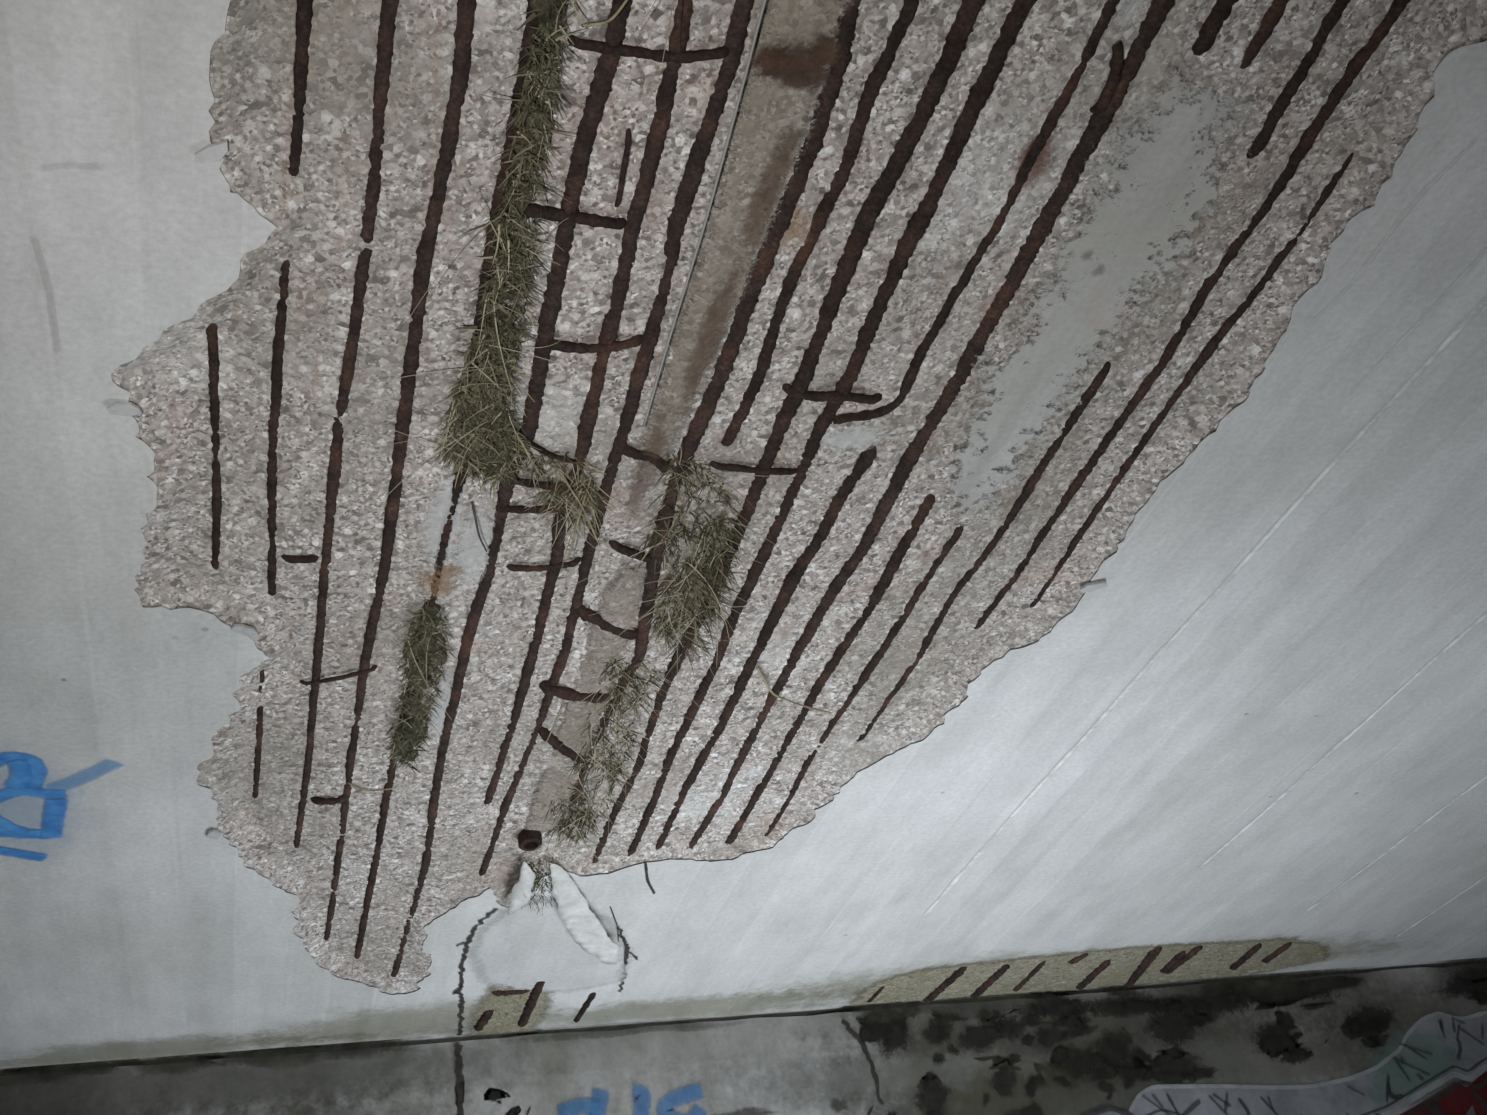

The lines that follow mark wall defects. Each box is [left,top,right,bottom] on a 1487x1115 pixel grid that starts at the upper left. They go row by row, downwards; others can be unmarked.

corrosion [752,34,844,89]
spalling [553,223,624,345]
spalling [579,56,667,221]
spalling [615,0,773,448]
spalling [807,0,1108,415]
corrosion [1016,139,1051,185]
spalling [509,350,597,507]
damp [227,1041,401,1067]
crack [452,909,498,1115]
damp [538,1023,711,1040]
damp [856,970,1356,1115]
damp [1439,958,1487,1002]